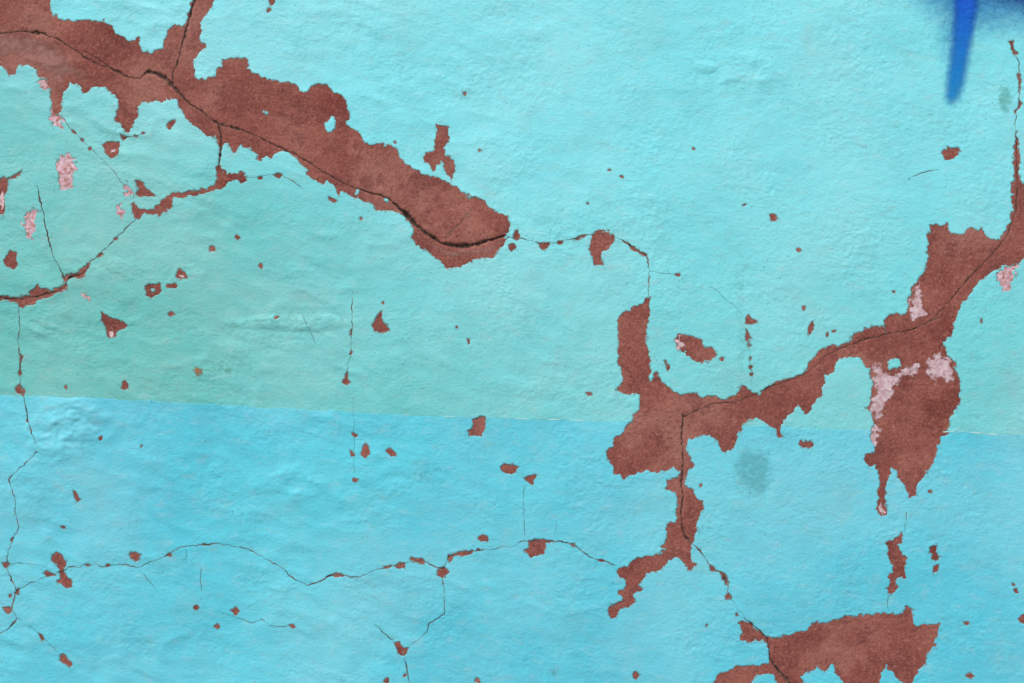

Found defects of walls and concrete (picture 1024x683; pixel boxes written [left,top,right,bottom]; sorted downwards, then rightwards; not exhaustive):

peeling [101,312,128,338]
peeling [0,0,510,269]
crack [0,187,616,683]
crack [1,0,670,295]
peeling [589,229,615,265]
peeling [607,139,1024,618]
crack [680,42,1022,683]
peeling [714,606,940,683]